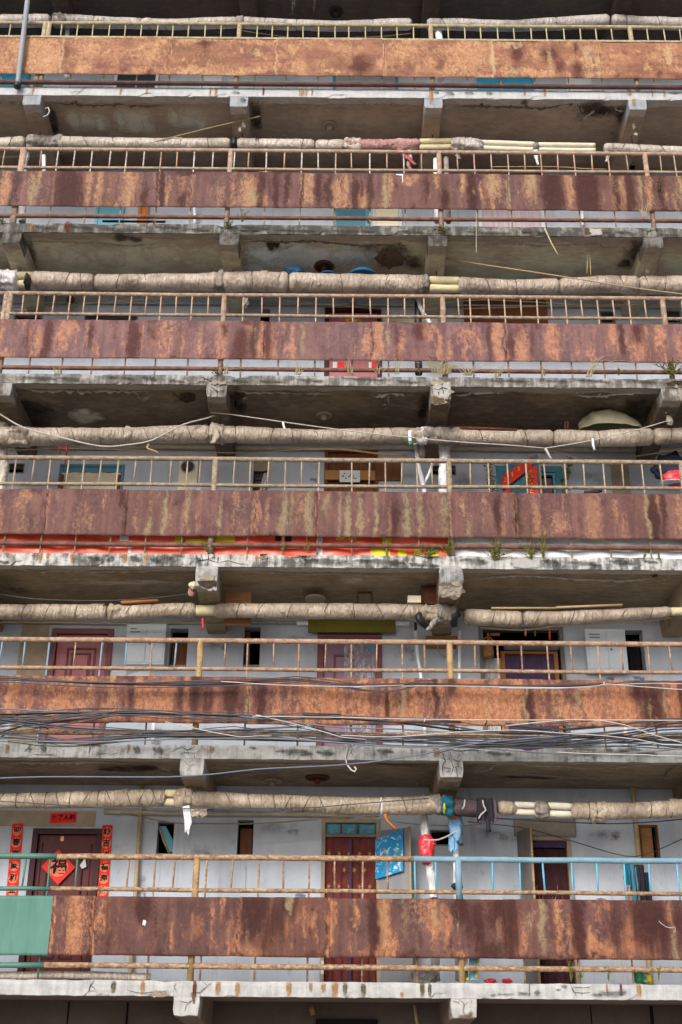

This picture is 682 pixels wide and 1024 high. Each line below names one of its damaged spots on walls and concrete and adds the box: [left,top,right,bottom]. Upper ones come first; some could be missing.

spalling [431,379,504,405]
crack [431,749,483,777]
crack [126,983,211,1008]